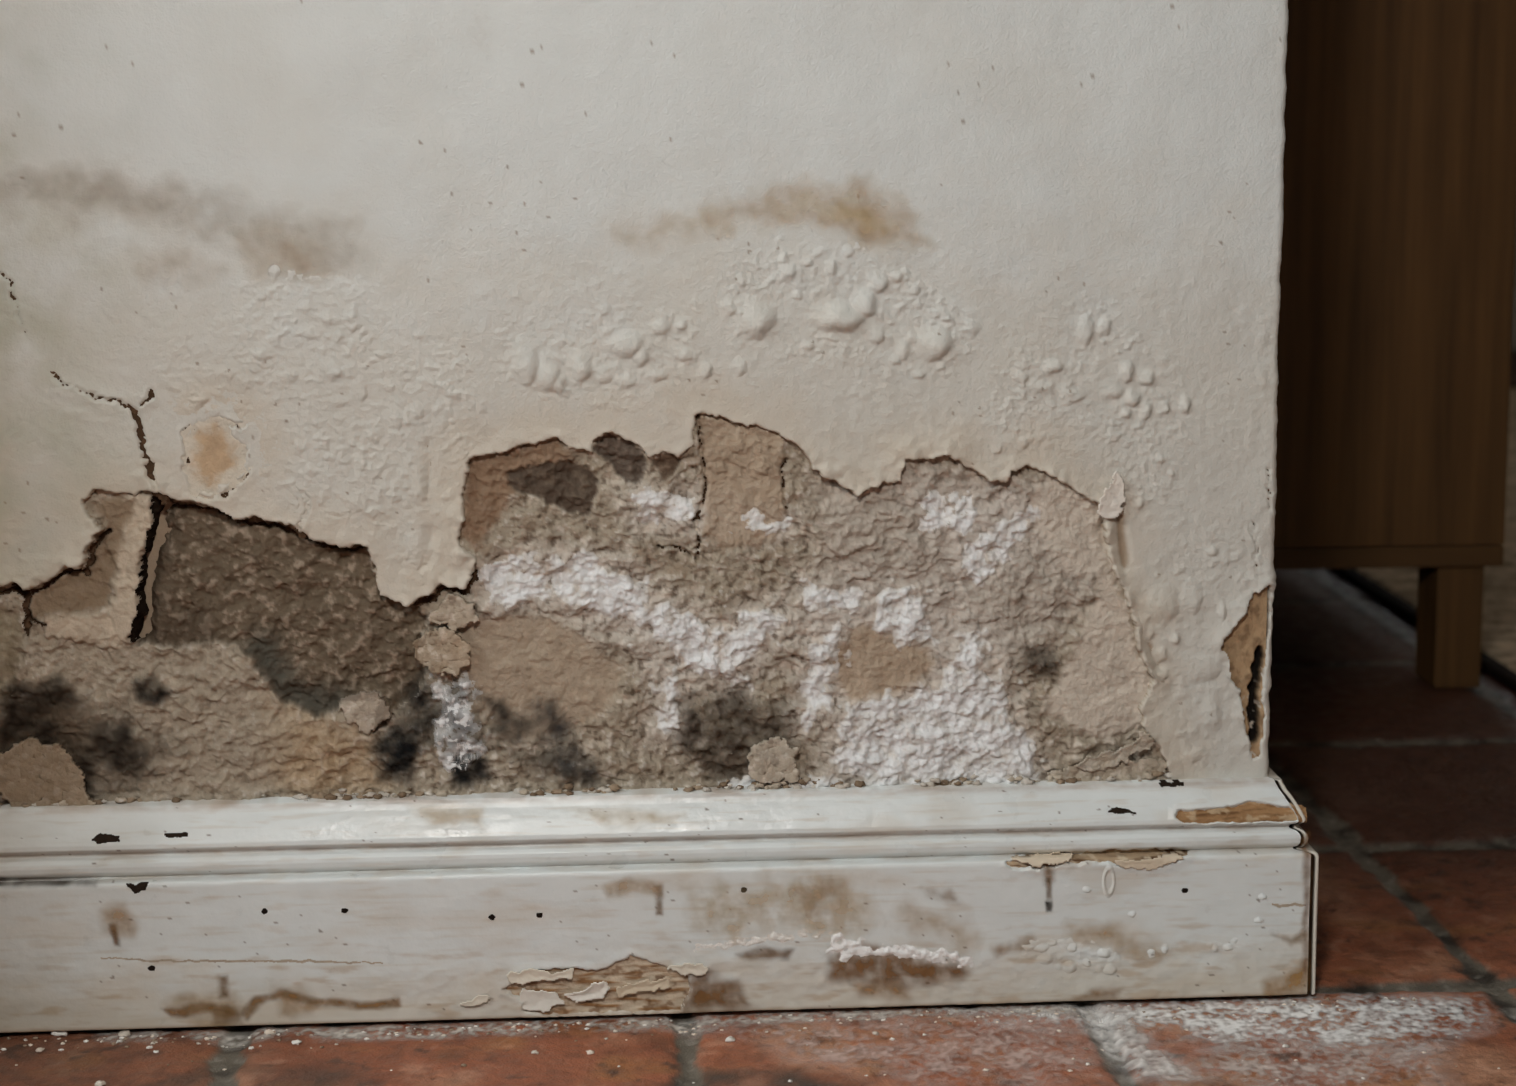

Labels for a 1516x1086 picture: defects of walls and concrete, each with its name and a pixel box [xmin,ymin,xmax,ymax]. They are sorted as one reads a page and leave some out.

crack [1,273,26,333]
efflorescence [630,486,696,525]
efflorescence [726,507,793,536]
efflorescence [915,488,1055,588]
spalling [0,413,1184,807]
mould [136,683,169,704]
water stain [477,537,1053,788]
peeling [1221,586,1268,758]
water stain [376,670,523,784]
peeling [92,833,120,844]
spalling [1176,801,1307,824]
peeling [507,963,708,1013]